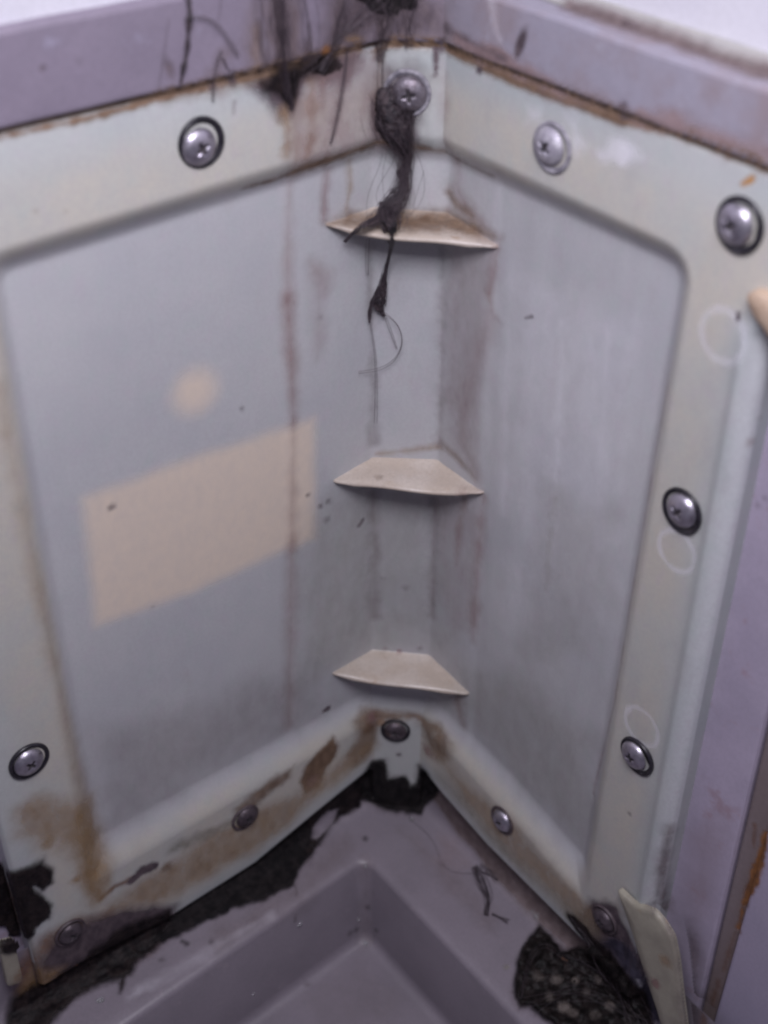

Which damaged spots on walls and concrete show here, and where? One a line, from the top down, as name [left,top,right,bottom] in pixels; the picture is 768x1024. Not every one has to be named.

rust [236,709,449,814]
rust [101,862,171,900]
leakage [0,743,439,1024]
rust [736,824,768,933]